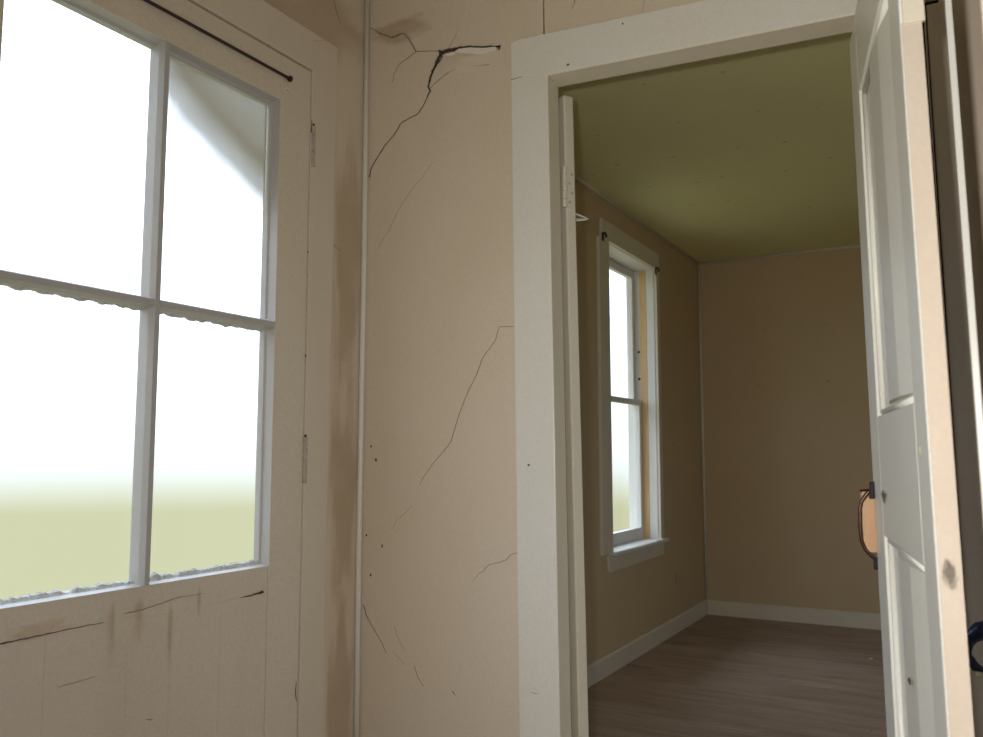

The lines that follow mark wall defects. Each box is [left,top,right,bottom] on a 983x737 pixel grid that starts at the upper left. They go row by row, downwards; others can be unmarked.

crack [369,27,501,177]
crack [392,326,514,530]
crack [363,605,424,687]